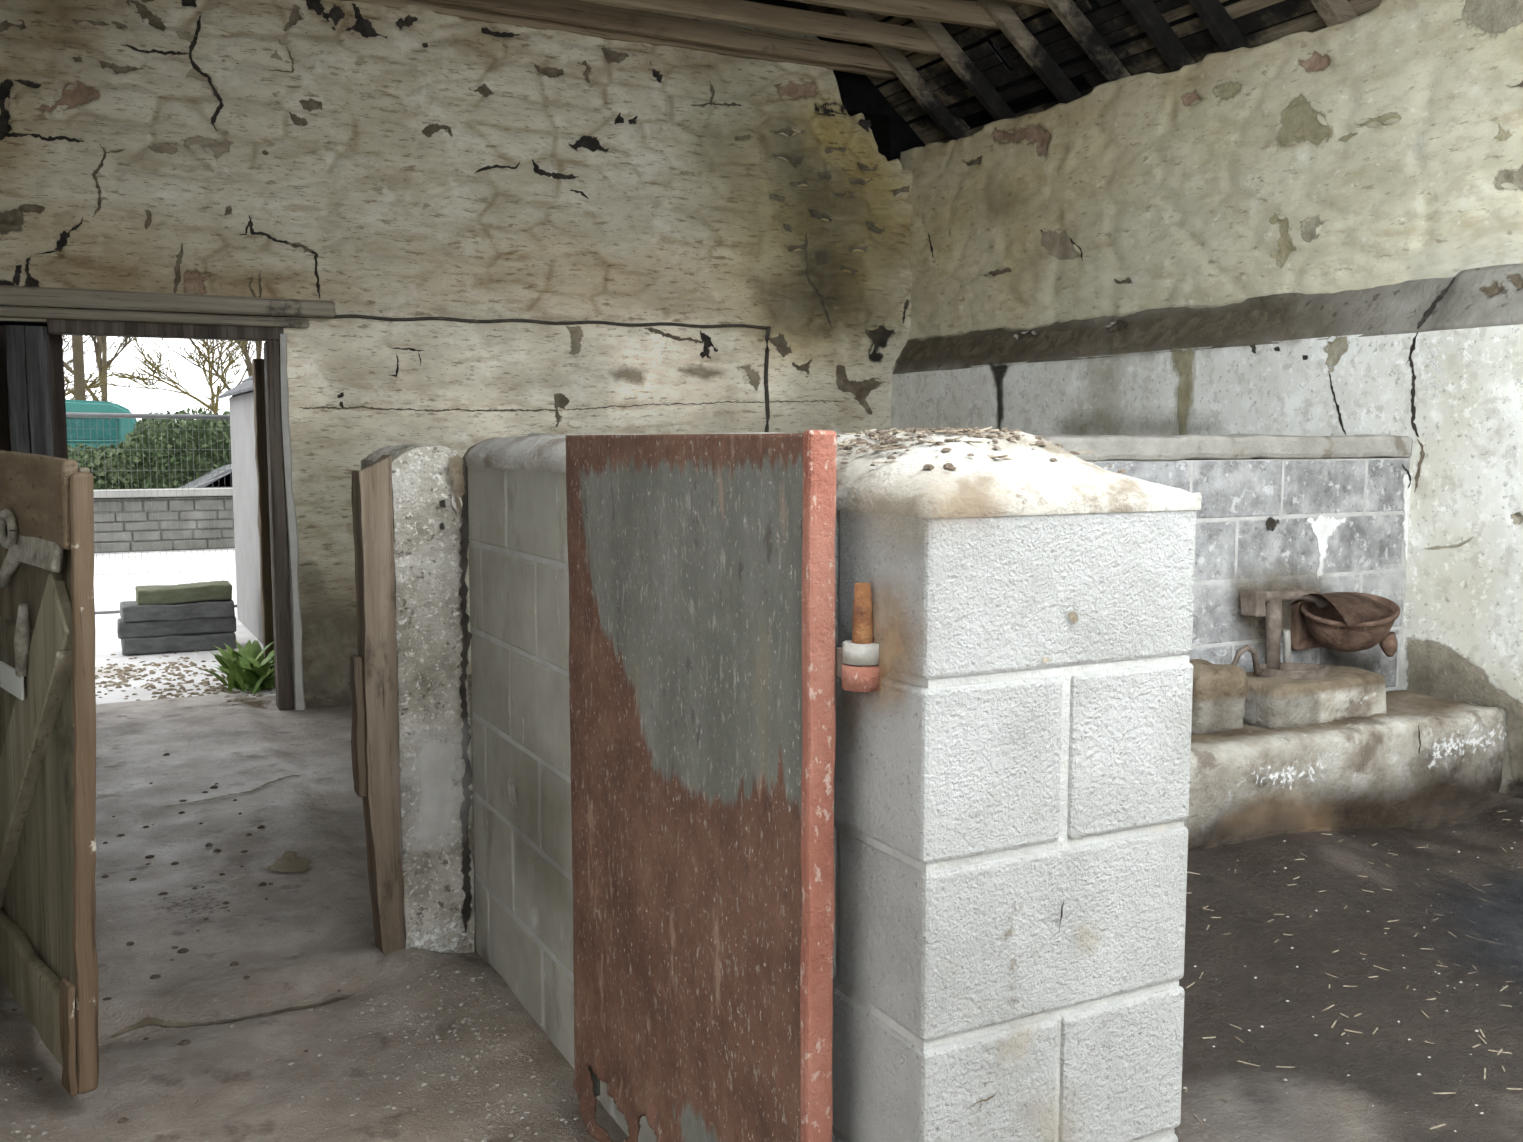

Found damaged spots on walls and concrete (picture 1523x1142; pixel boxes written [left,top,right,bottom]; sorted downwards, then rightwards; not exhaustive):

peeling [1463,0,1523,35]
spalling [73,57,143,74]
crack [121,15,224,131]
peeling [0,79,100,134]
crack [0,132,125,255]
spalling [962,156,982,166]
spalling [993,125,1051,156]
peeling [1277,95,1401,147]
peeling [1495,165,1523,190]
crack [240,215,320,299]
crack [1402,277,1455,493]
leakage [1307,515,1346,578]